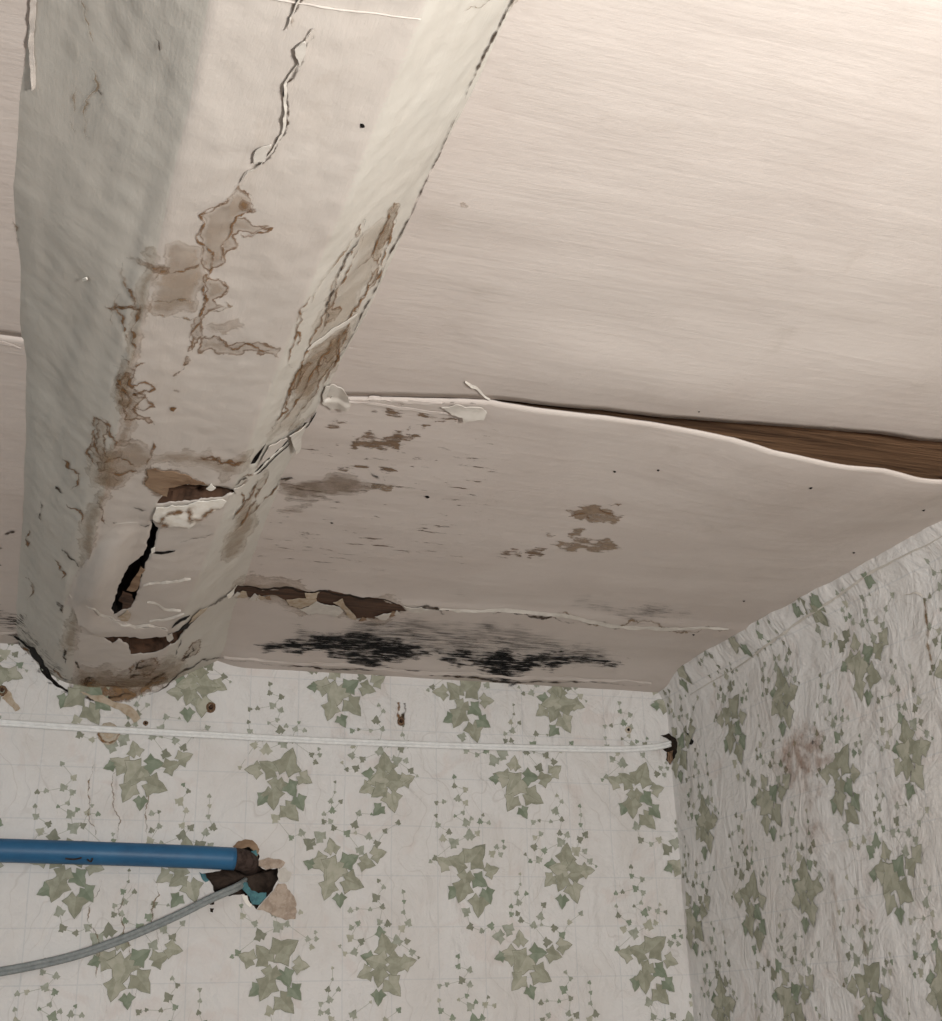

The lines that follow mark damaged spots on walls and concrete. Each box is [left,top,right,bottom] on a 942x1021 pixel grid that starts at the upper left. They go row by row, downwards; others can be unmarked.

crack [470,0,514,85]
crack [241,0,313,182]
crack [390,122,454,254]
peeling [322,381,490,474]
peeling [145,468,216,497]
peeling [227,585,439,621]
damp [257,621,620,686]
spalling [199,839,297,920]